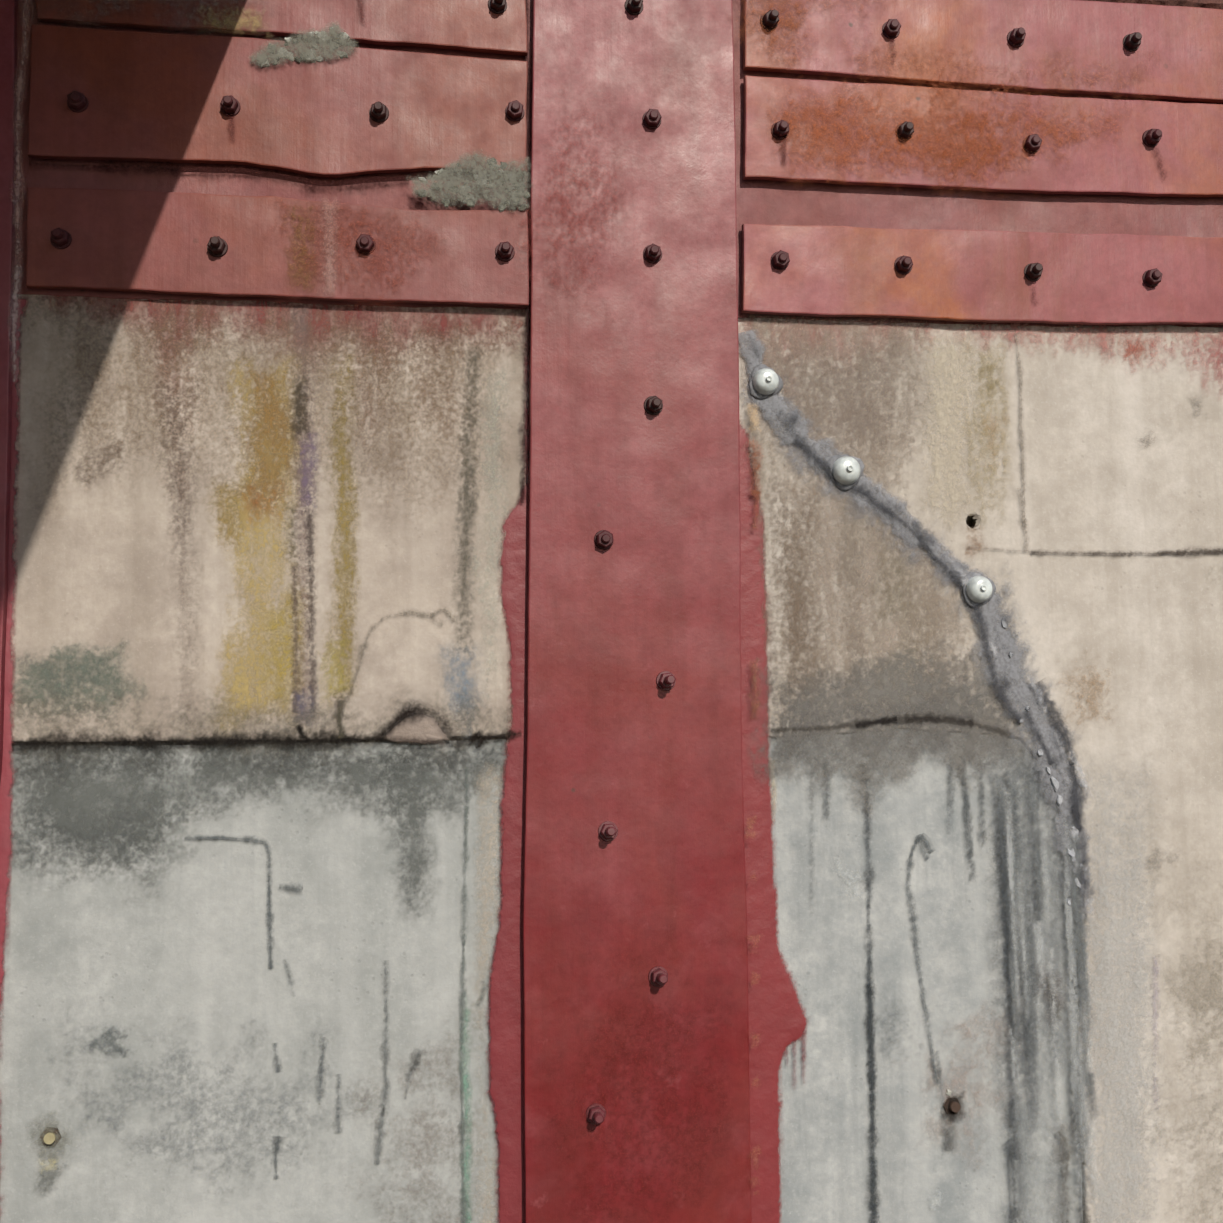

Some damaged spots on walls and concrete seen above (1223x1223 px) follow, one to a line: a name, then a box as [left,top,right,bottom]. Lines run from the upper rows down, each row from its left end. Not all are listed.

damp [292,383,315,721]
damp [459,382,499,630]
damp [11,743,504,977]
crack [738,330,1094,1223]
damp [769,547,1158,1223]